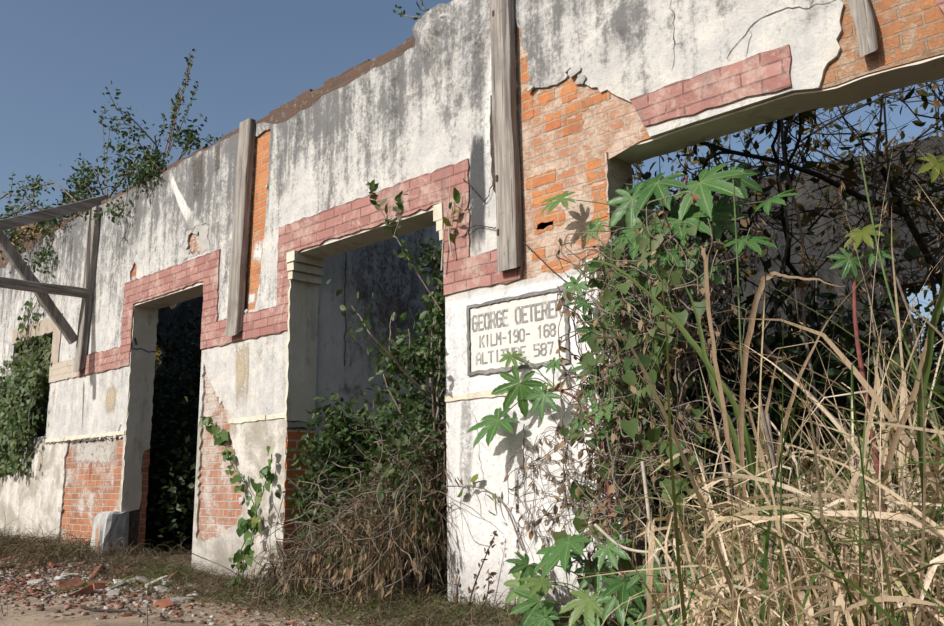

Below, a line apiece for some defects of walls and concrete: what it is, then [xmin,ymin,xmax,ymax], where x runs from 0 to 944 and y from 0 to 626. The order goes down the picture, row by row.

crack [727,0,834,58]
flaking render [820,0,944,89]
flaking render [244,130,271,313]
water stain [253,242,263,260]
water stain [469,137,485,244]
flaking render [515,19,651,280]
flaking render [58,435,123,546]
flaking render [198,369,244,541]